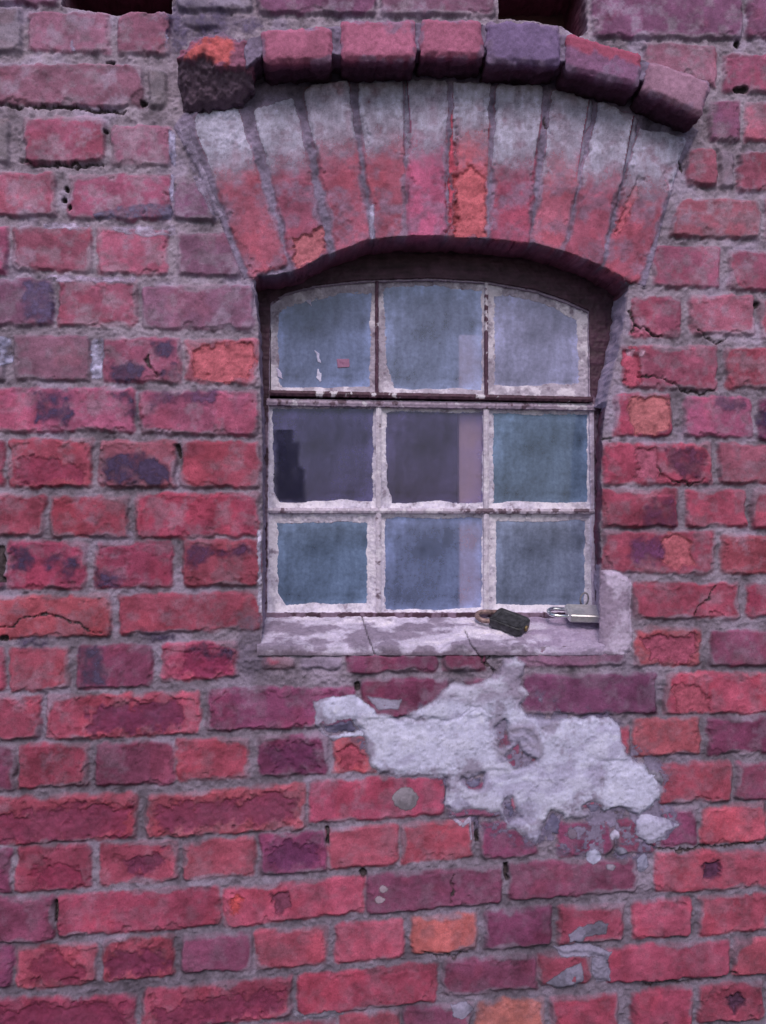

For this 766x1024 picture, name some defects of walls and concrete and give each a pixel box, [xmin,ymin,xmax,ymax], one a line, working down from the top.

spalling [445,111,487,238]
spalling [292,226,326,268]
crack [627,310,659,337]
crack [641,375,714,396]
crack [9,612,102,634]
peeling [313,657,679,872]